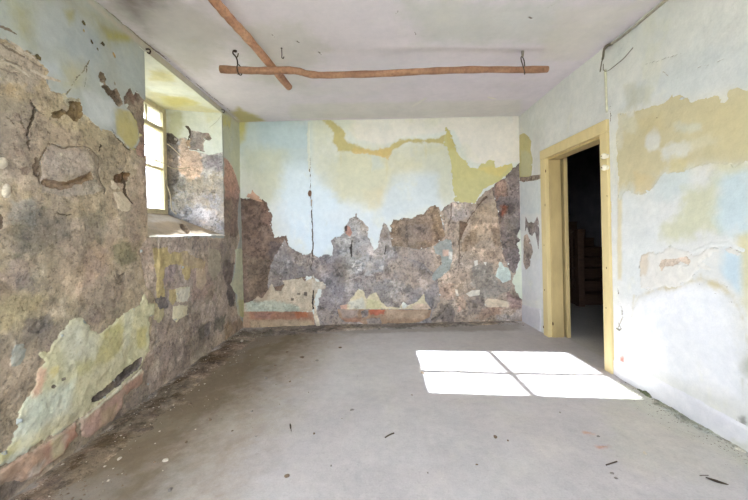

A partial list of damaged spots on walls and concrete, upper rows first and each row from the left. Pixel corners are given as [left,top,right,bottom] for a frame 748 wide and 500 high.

crack [7,99,133,204]
peeling [616,87,748,201]
flaking render [0,38,546,500]
crack [307,169,315,309]
peeling [638,241,745,290]